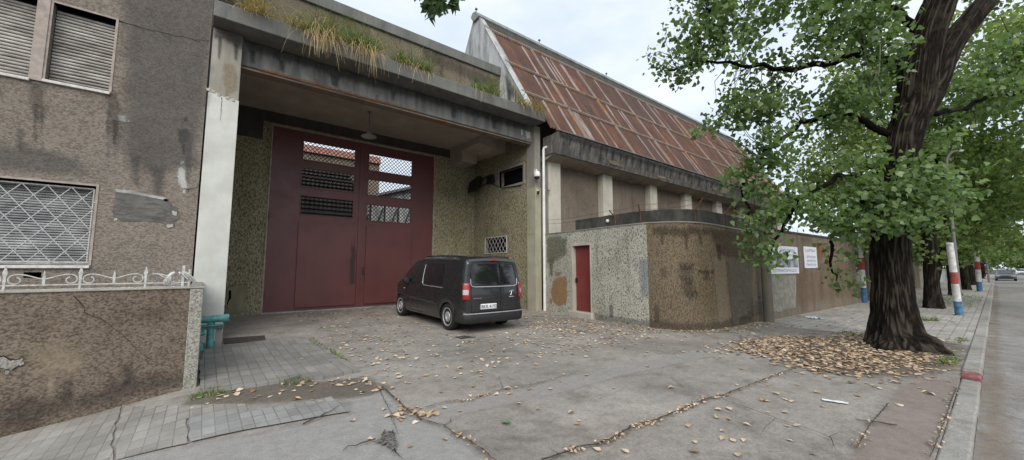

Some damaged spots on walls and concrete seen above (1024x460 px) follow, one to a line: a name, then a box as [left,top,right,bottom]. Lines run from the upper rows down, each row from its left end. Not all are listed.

peeling [178,161,187,193]
peeling [550,272,567,305]
crack [73,295,170,360]
spalling [0,355,27,375]
crack [375,358,571,460]
crack [541,368,889,460]